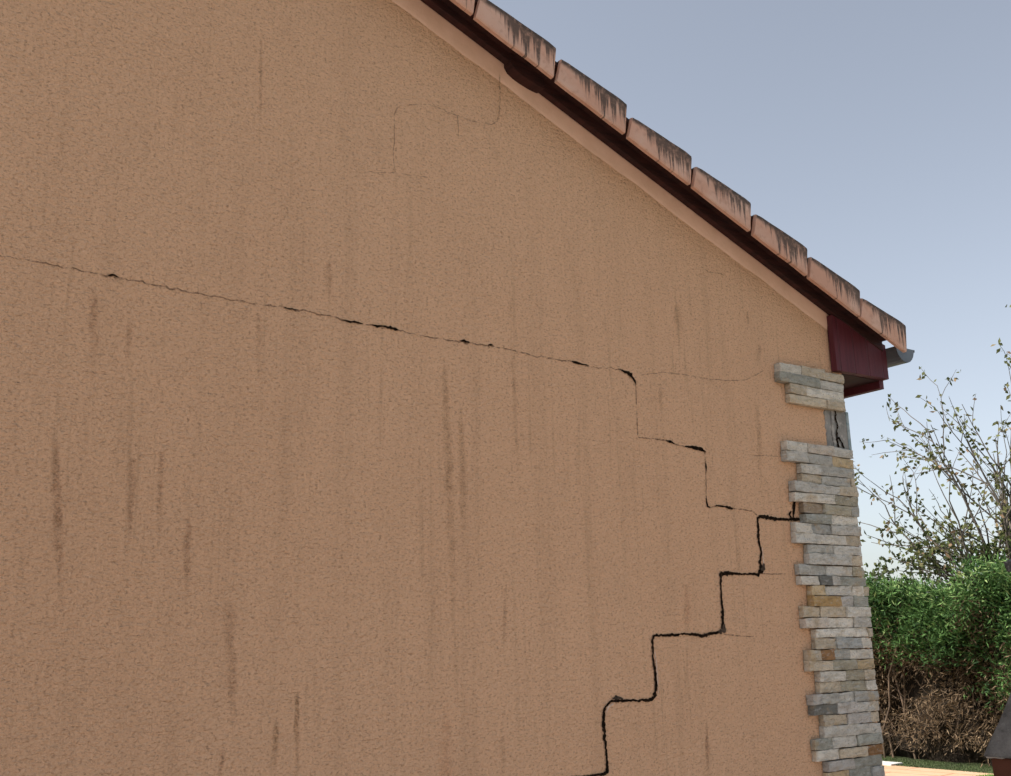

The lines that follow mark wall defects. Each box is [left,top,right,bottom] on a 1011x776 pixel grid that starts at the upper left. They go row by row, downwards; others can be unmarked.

crack [0,255,800,776]